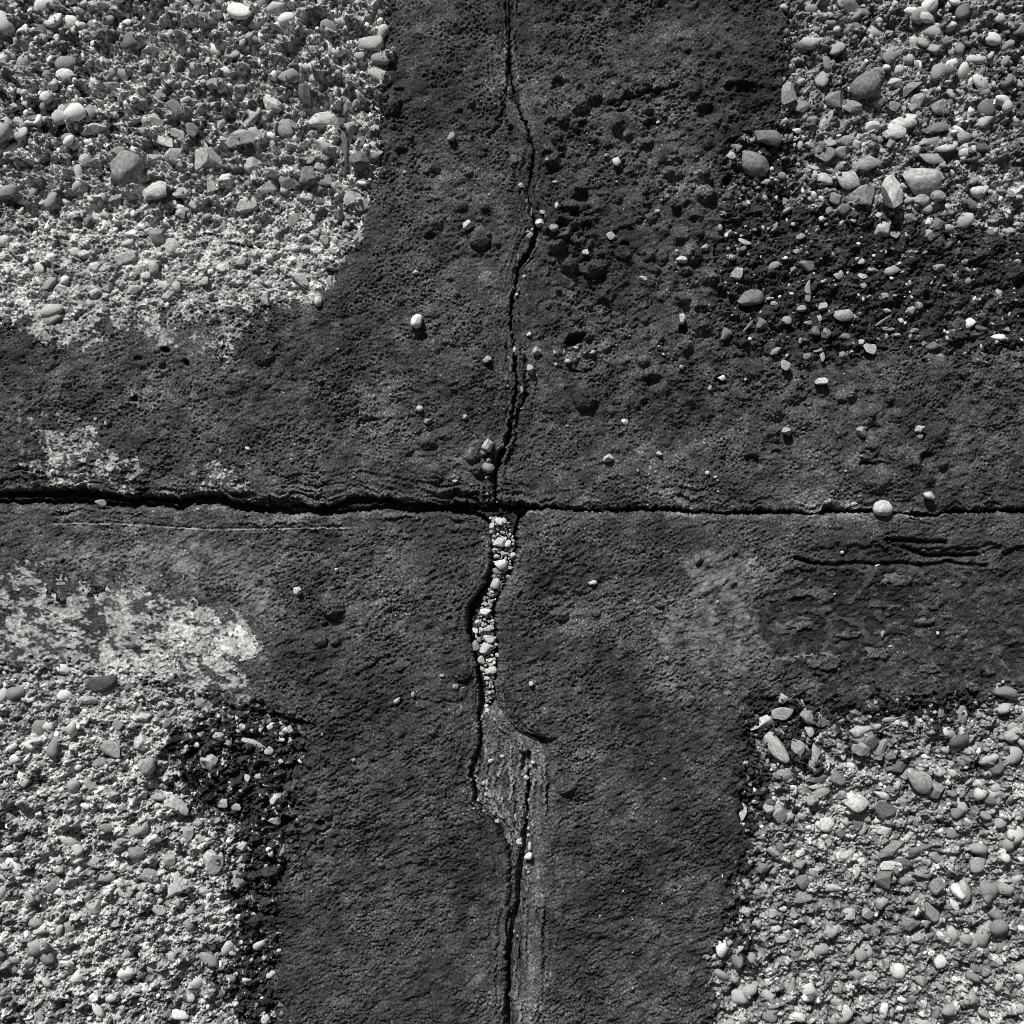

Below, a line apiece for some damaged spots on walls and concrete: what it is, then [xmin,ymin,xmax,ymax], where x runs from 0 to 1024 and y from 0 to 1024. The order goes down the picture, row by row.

crack [488,64,513,139]
crack [614,83,679,113]
crack [158,190,203,225]
spalling [0,0,395,326]
crack [202,232,285,251]
spalling [713,0,1024,377]
crack [506,359,529,466]
crack [53,522,357,531]
crack [794,538,988,568]
spalling [700,562,1024,1024]
spalling [0,659,336,1024]
crack [134,898,199,919]